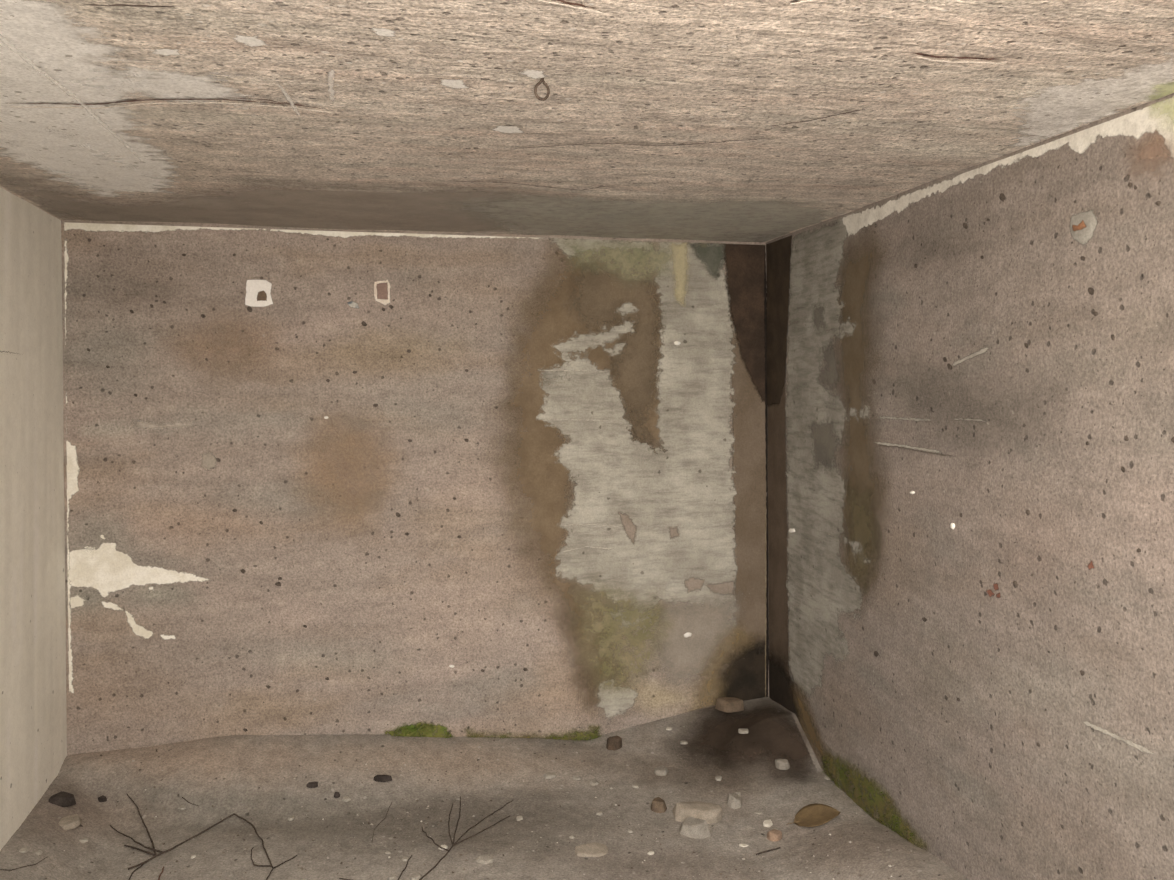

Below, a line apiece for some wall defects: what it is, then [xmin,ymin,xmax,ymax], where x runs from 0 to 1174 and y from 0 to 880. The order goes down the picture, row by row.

water stain [0,0,248,197]
peeling [66,424,209,693]
peeling [64,222,737,635]
peeling [596,679,637,717]
water stain [471,197,820,778]
water stain [836,242,884,594]
peeling [785,97,1174,696]